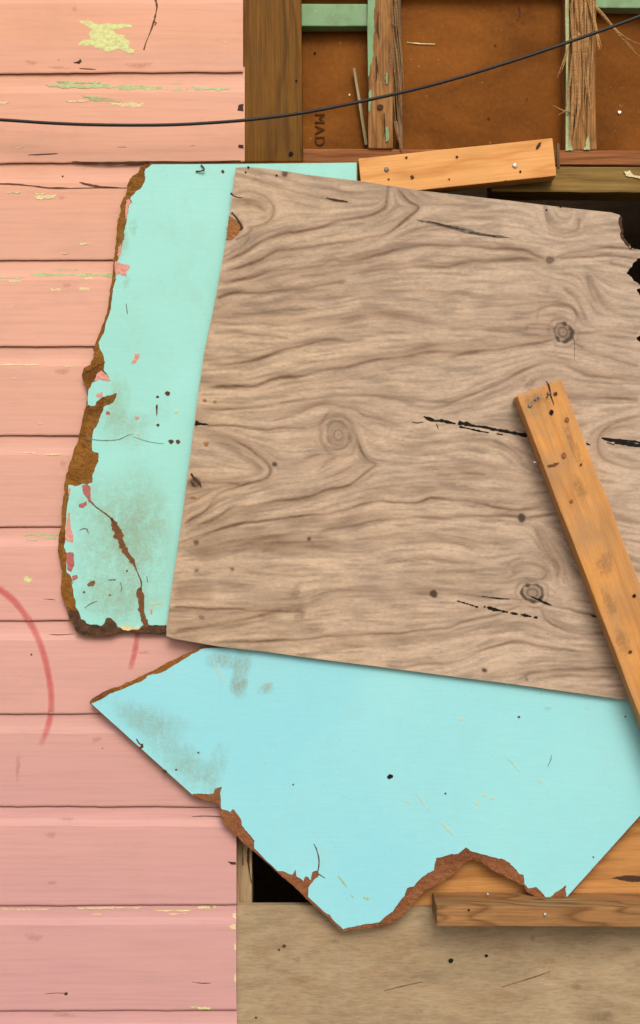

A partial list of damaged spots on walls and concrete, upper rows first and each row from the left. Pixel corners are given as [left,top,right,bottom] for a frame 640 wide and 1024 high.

peeling [78,20,134,53]
crack [143,0,158,50]
peeling [48,81,230,107]
spalling [0,164,166,636]
crack [79,501,150,628]
spalling [192,787,255,849]
spalling [278,869,319,901]
spalling [326,848,566,931]